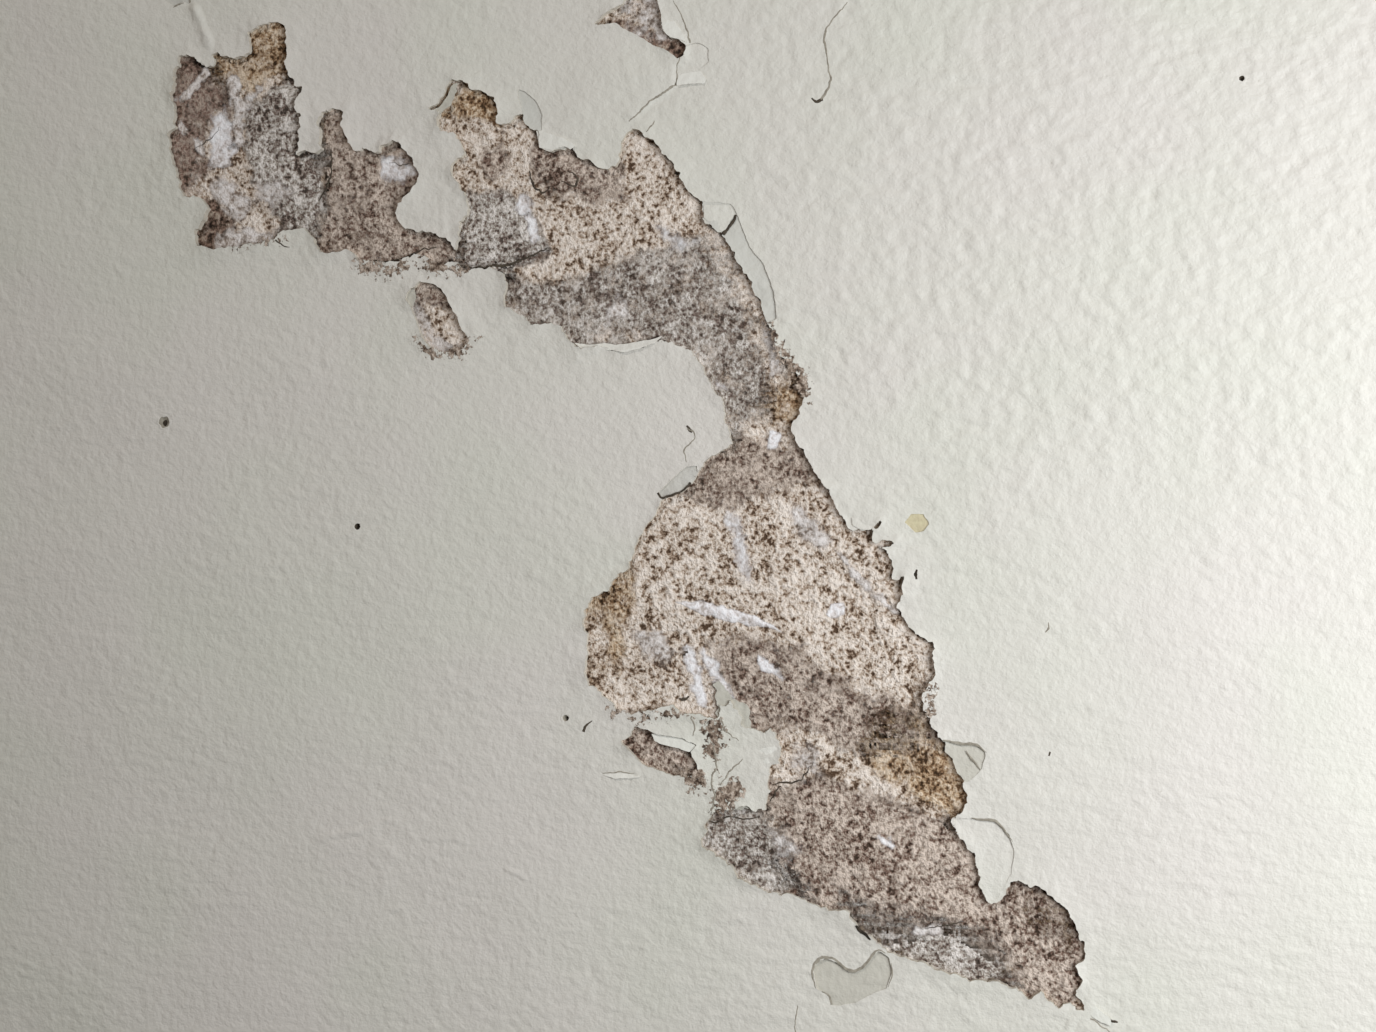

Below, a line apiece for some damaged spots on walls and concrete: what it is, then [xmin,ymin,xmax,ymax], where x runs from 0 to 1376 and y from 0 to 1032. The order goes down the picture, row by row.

peeling [170,0,1111,1026]